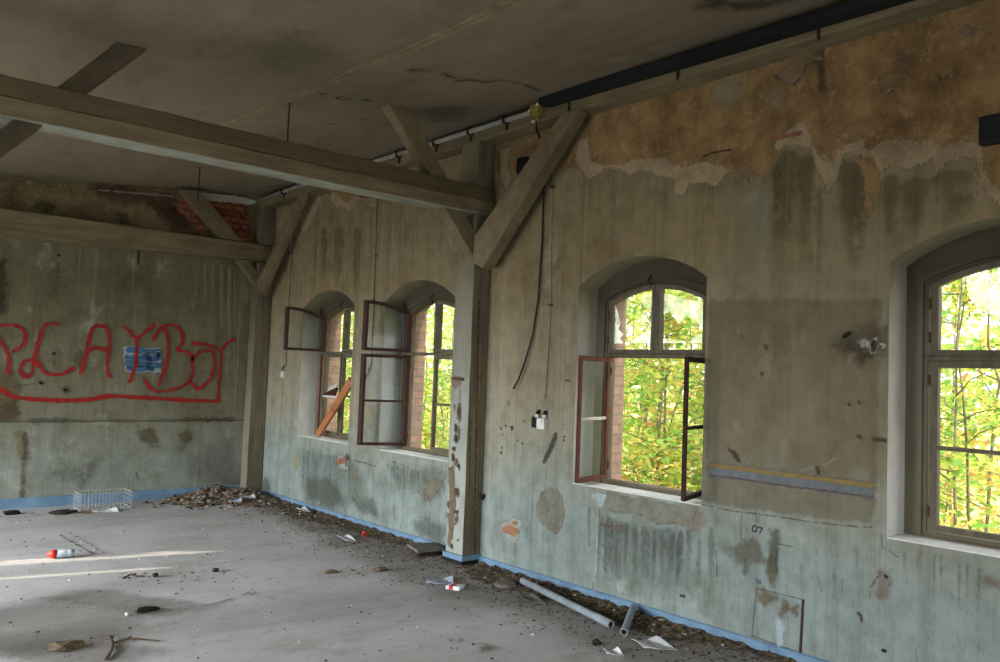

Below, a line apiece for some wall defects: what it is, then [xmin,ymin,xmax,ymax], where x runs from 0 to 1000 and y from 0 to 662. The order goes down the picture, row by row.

crack [443,73,539,91]
peeling [560,0,1000,219]
peeling [496,128,551,192]
peeling [0,178,215,238]
flaking render [195,190,253,243]
peeling [446,403,460,549]
spalling [498,518,521,544]
water stain [736,530,779,583]